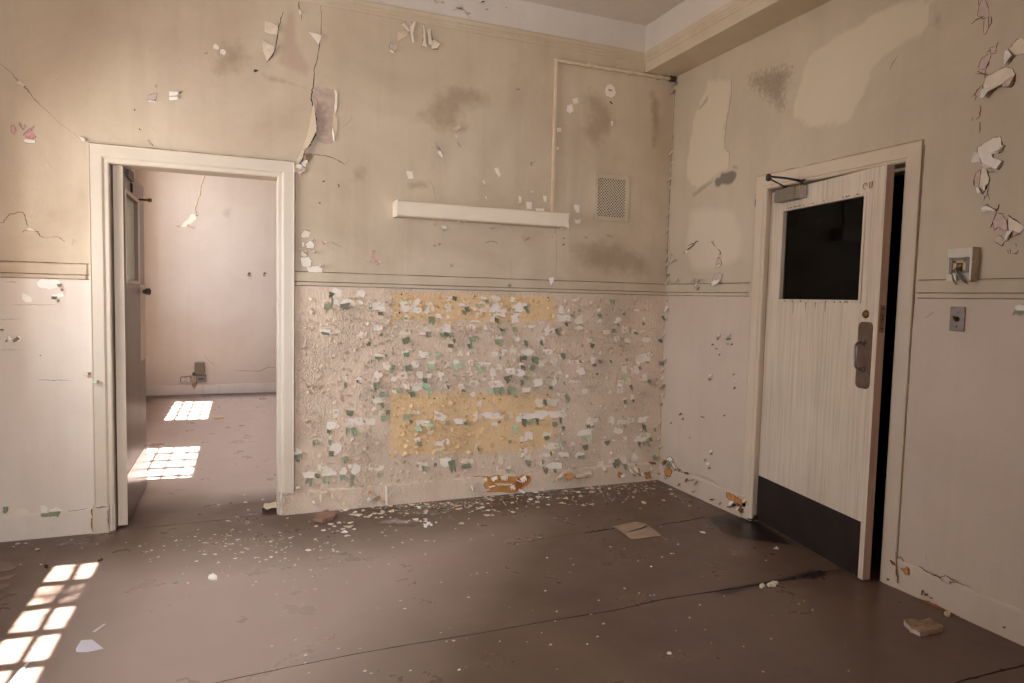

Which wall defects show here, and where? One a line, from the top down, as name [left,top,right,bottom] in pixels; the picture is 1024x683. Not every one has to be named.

peeling [262,6,338,177]
peeling [389,21,440,54]
leakage [405,75,500,143]
leakage [691,55,800,200]
peeling [970,38,1024,254]
crack [0,3,750,491]
peeling [294,134,698,524]
peeling [709,492,746,513]
crack [890,557,970,587]